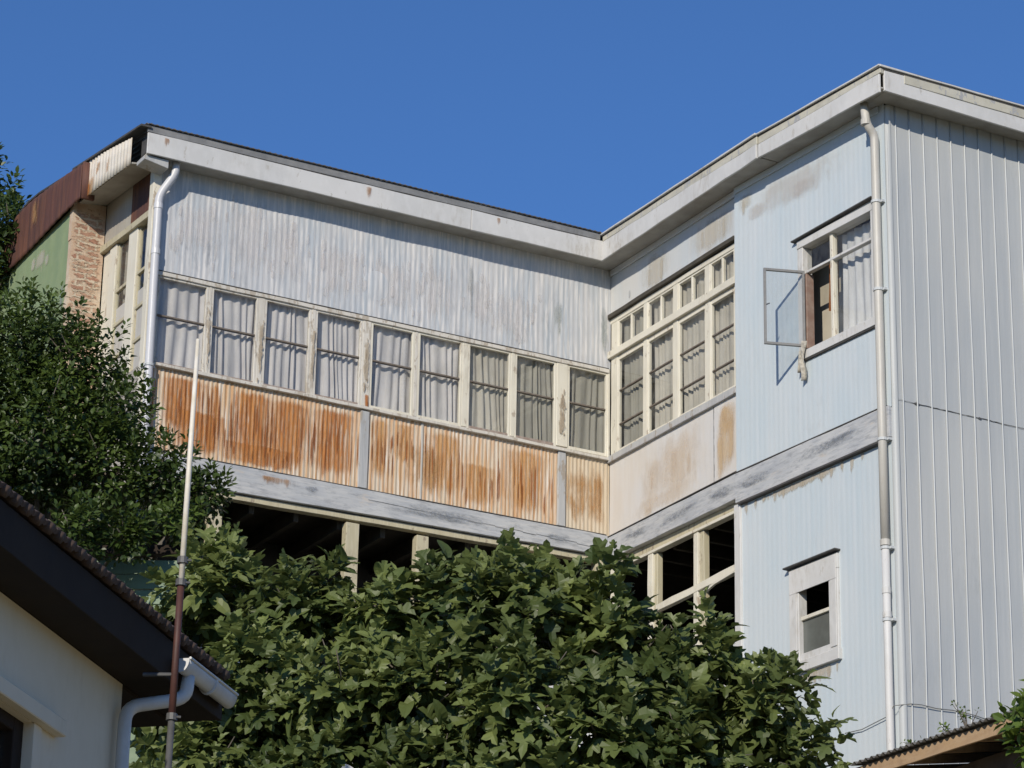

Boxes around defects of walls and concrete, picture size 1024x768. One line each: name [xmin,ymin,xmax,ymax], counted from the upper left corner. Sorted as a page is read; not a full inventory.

corrosion [152,377,359,483]
corrosion [371,422,552,511]
corrosion [567,476,602,514]